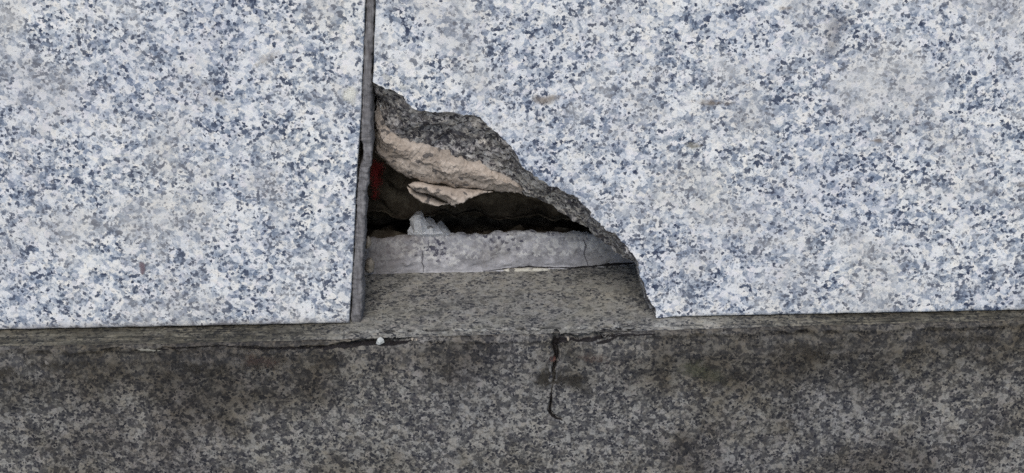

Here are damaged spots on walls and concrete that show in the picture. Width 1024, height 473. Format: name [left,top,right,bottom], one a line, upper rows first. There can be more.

spalling [373,82,656,316]
crack [136,340,414,351]
crack [548,333,655,421]